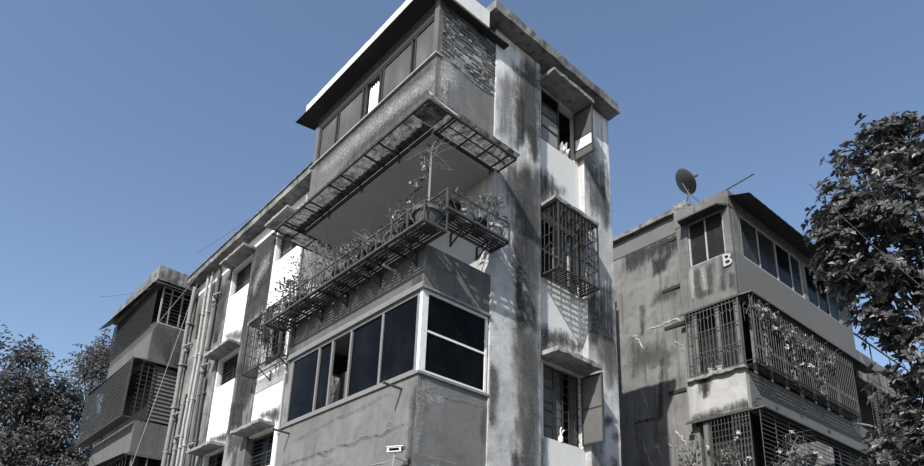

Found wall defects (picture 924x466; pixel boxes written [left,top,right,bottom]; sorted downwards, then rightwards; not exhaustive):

water stain [498,57,618,466]
water stain [625,235,677,276]
water stain [481,362,497,434]
water stain [632,342,670,419]